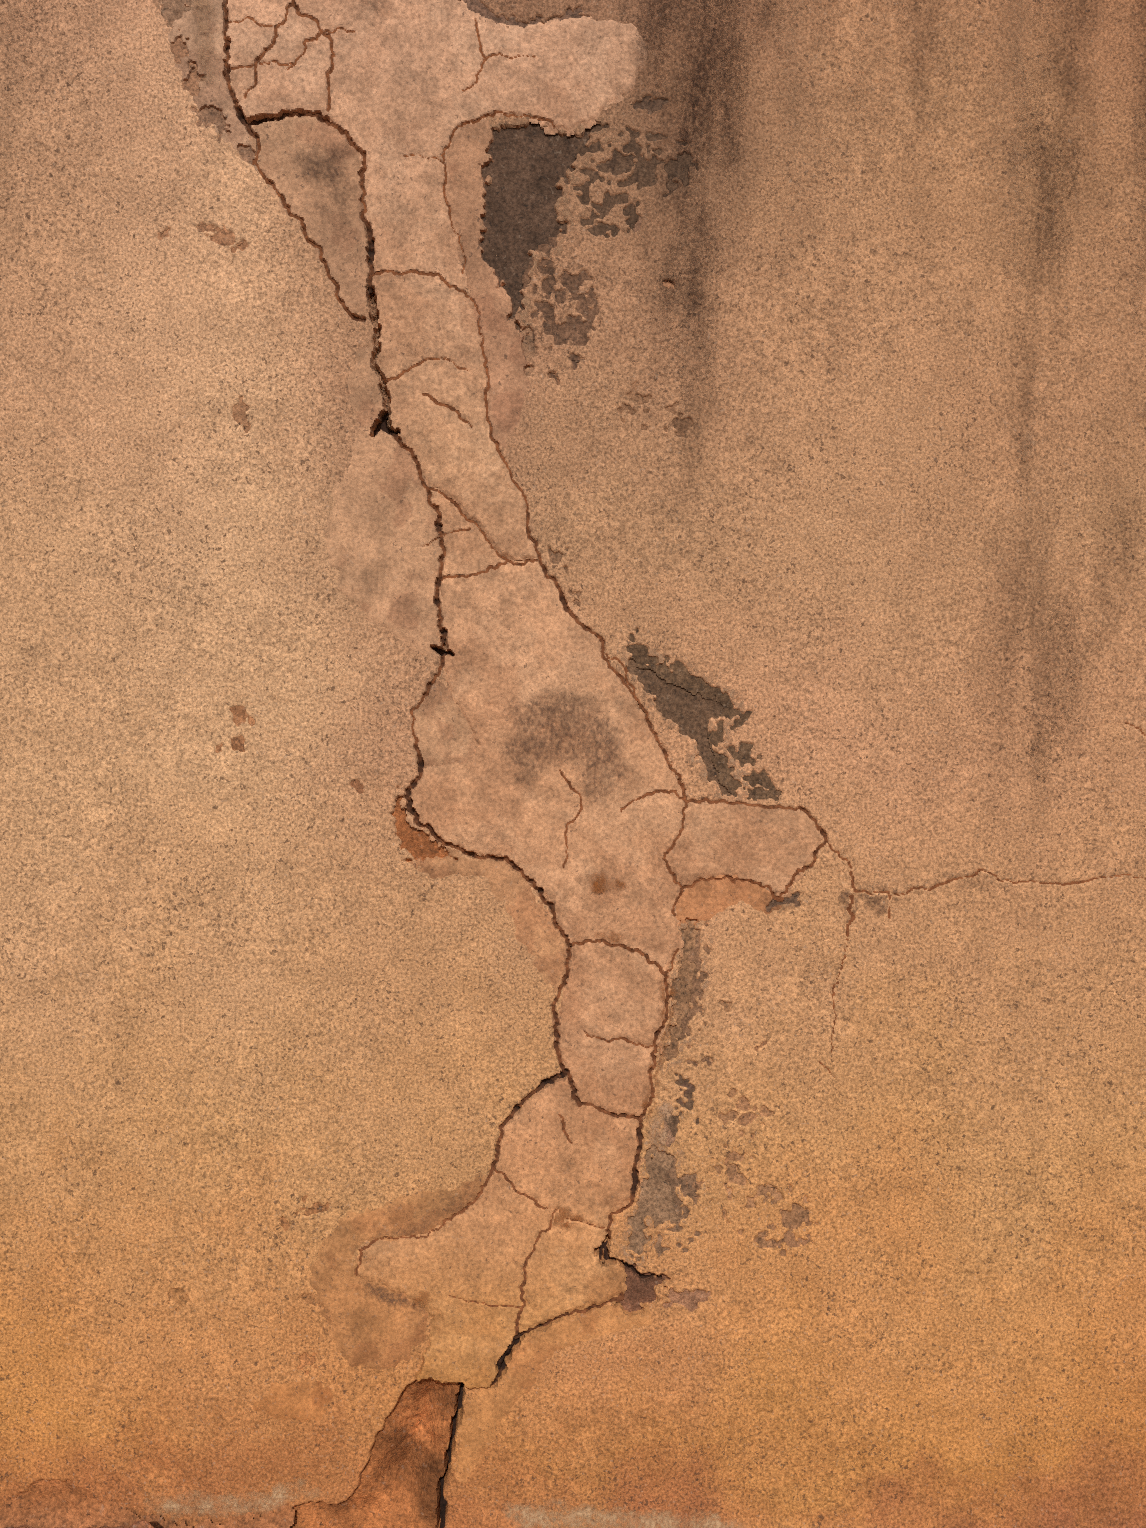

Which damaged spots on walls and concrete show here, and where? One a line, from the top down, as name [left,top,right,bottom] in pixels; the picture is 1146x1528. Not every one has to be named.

peeling [156,0,255,165]
peeling [463,0,590,28]
peeling [197,222,249,253]
peeling [479,120,698,385]
peeling [617,382,694,437]
peeling [216,706,255,753]
leakage [512,697,622,782]
crack [224,0,1146,1385]
peeling [619,629,782,801]
peeling [392,796,457,862]
peeling [620,919,817,1312]
crack [439,1382,464,1528]